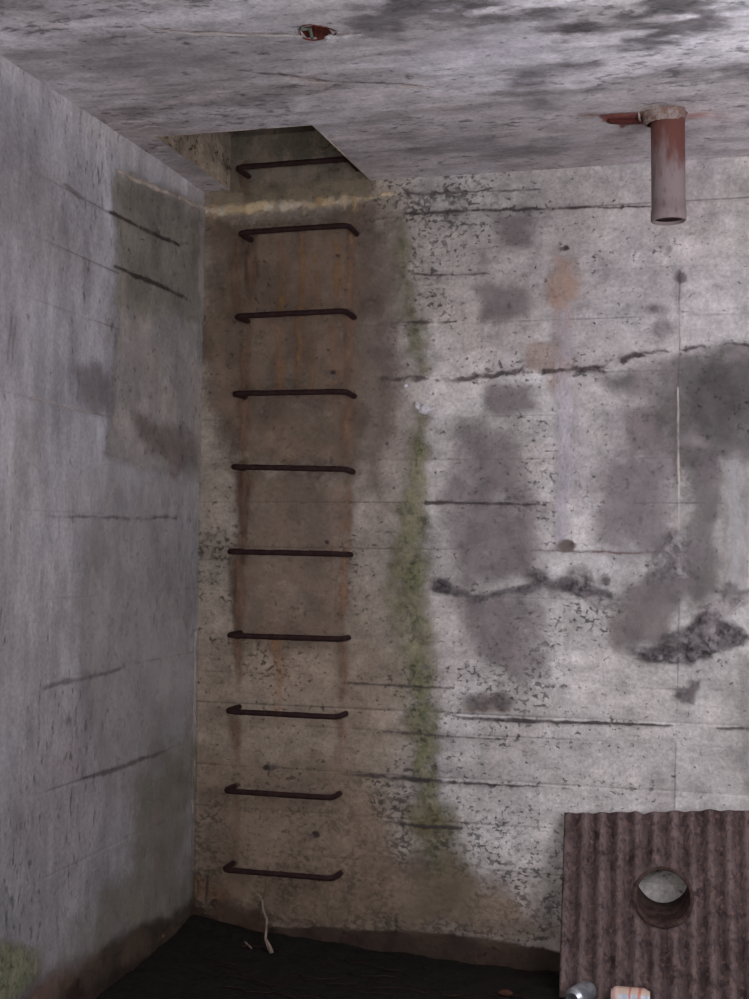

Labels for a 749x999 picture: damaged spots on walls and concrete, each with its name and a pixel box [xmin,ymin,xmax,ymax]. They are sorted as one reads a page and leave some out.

water stain [325,0,728,52]
rust [590,109,647,128]
crack [404,189,651,215]
crack [677,270,687,309]
crack [381,340,705,382]
crack [674,388,682,424]
water stain [446,434,535,580]
water stain [608,345,749,647]
rust [232,463,249,675]
spalling [631,585,749,665]
spalling [676,681,699,704]
water stain [26,631,560,999]